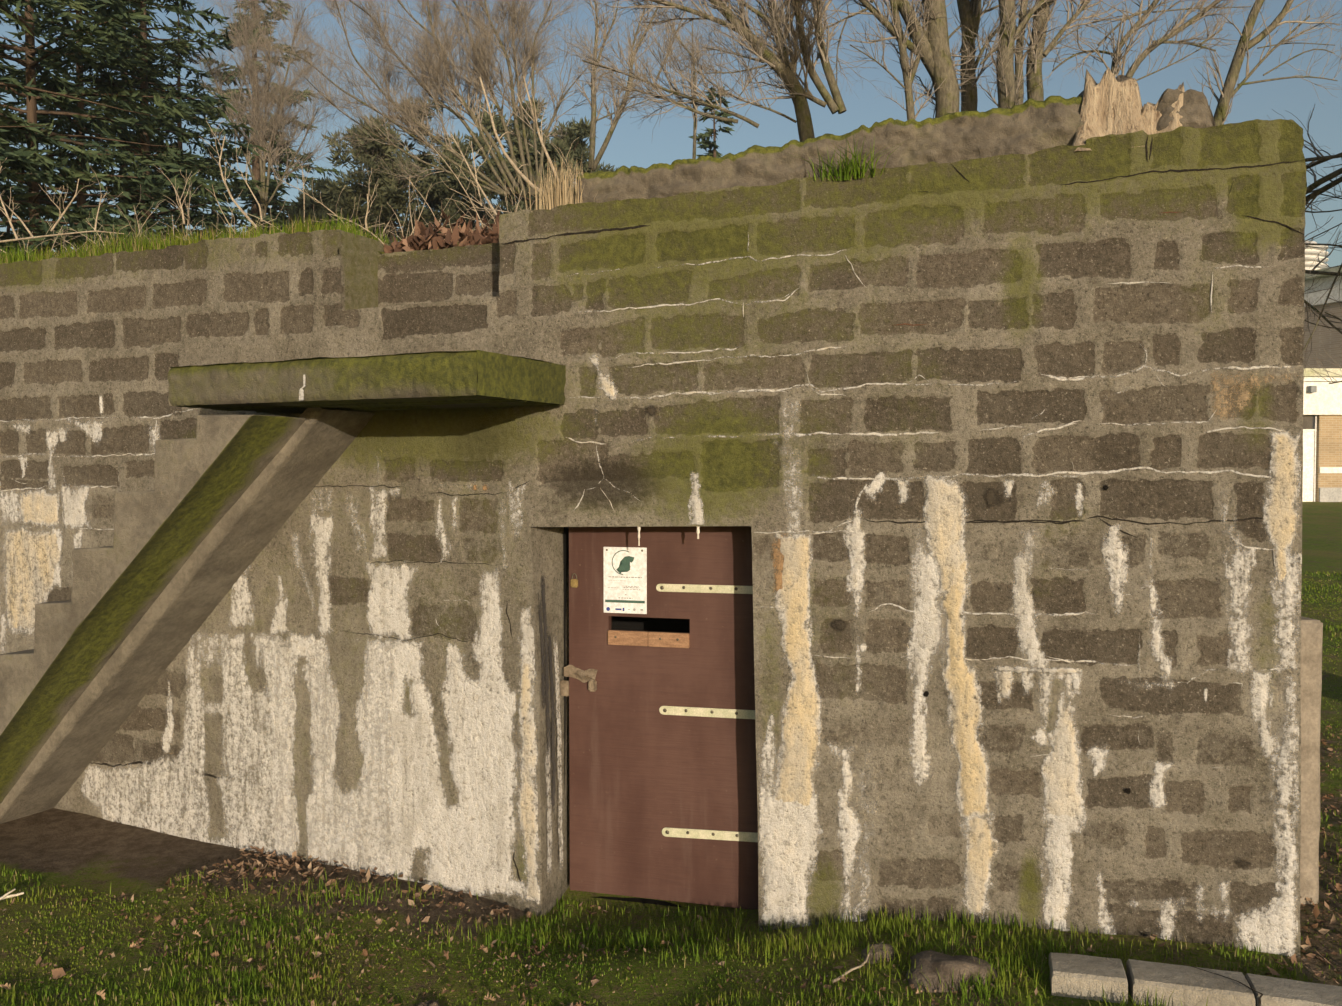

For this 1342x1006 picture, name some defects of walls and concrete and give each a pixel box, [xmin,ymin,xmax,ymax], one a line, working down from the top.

leakage [0,396,103,651]
leakage [81,483,563,904]
crack [585,288,799,317]
leakage [759,400,869,927]
crack [570,346,1290,439]
leakage [907,475,998,922]
crack [872,603,1091,616]
crack [755,463,1274,534]
leakage [994,530,1108,931]
crack [962,515,1277,568]
crack [1062,137,1307,234]
leakage [1197,431,1302,956]